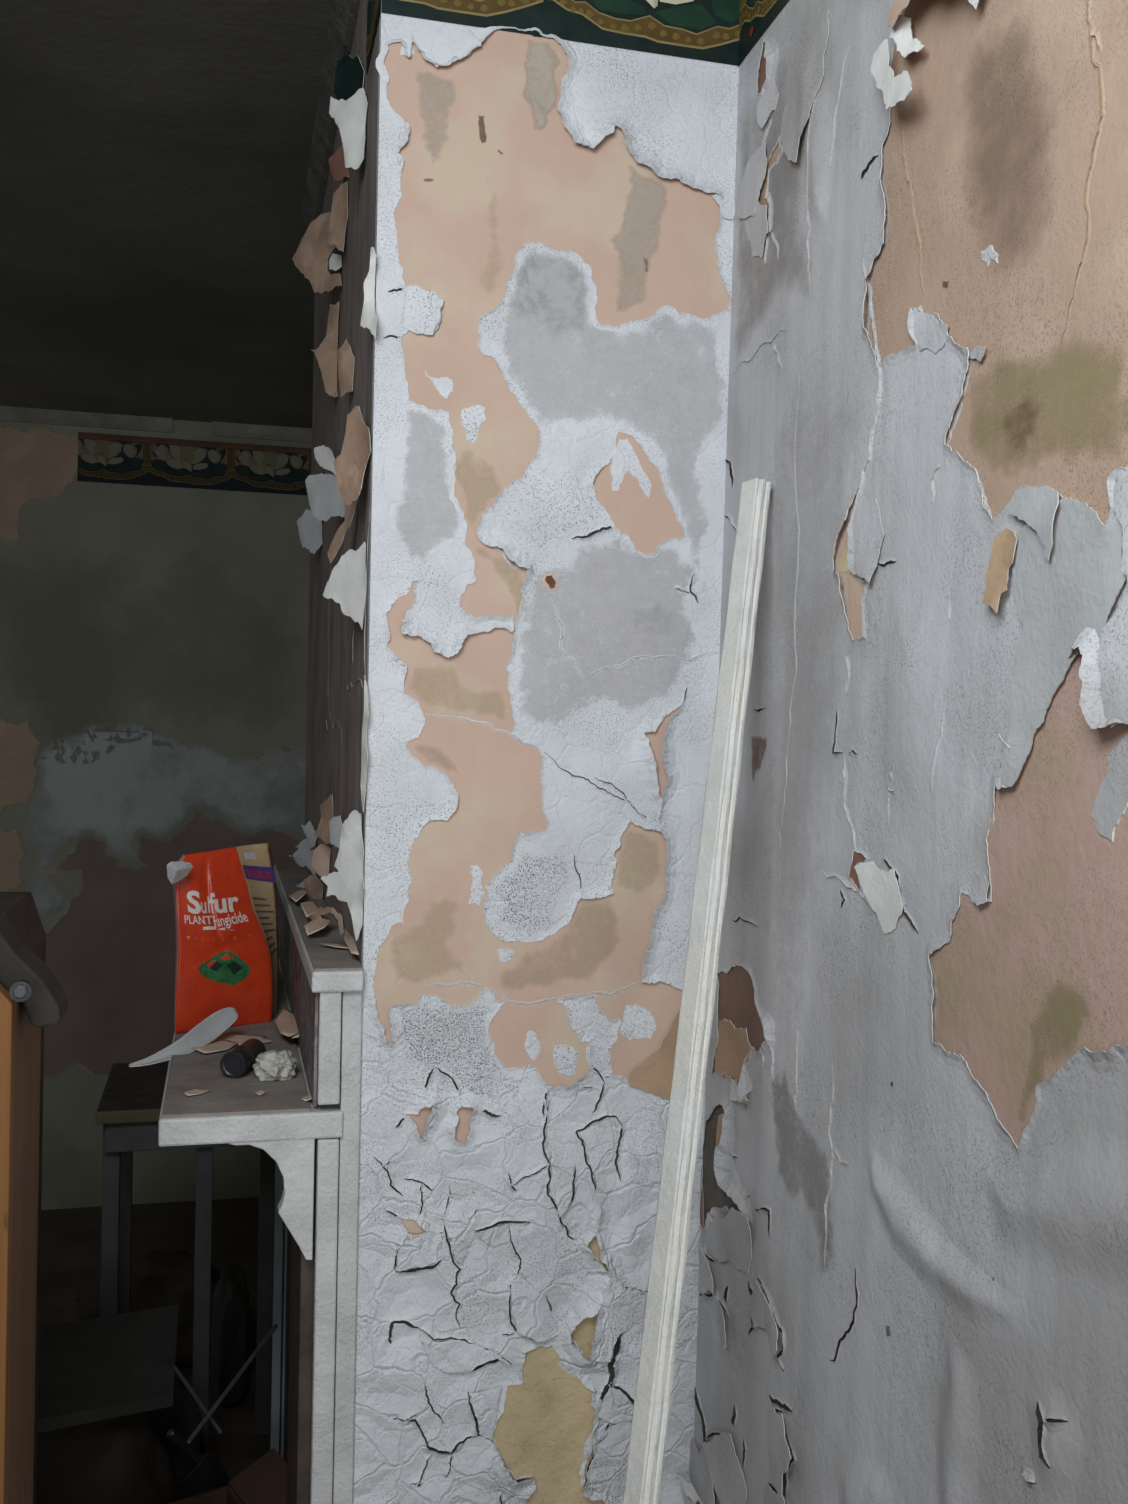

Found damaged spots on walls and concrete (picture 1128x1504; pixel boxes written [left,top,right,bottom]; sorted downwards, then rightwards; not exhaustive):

peeling [0,422,78,546]
peeling [44,7,829,1108]
peeling [869,0,1128,1147]
peeling [0,823,30,892]
damp [28,725,306,913]
peeling [823,845,919,935]
crack [372,1042,647,1504]
peeling [480,1199,626,1504]
crack [693,1240,798,1504]
crack [731,1152,772,1239]
crack [752,1030,860,1364]